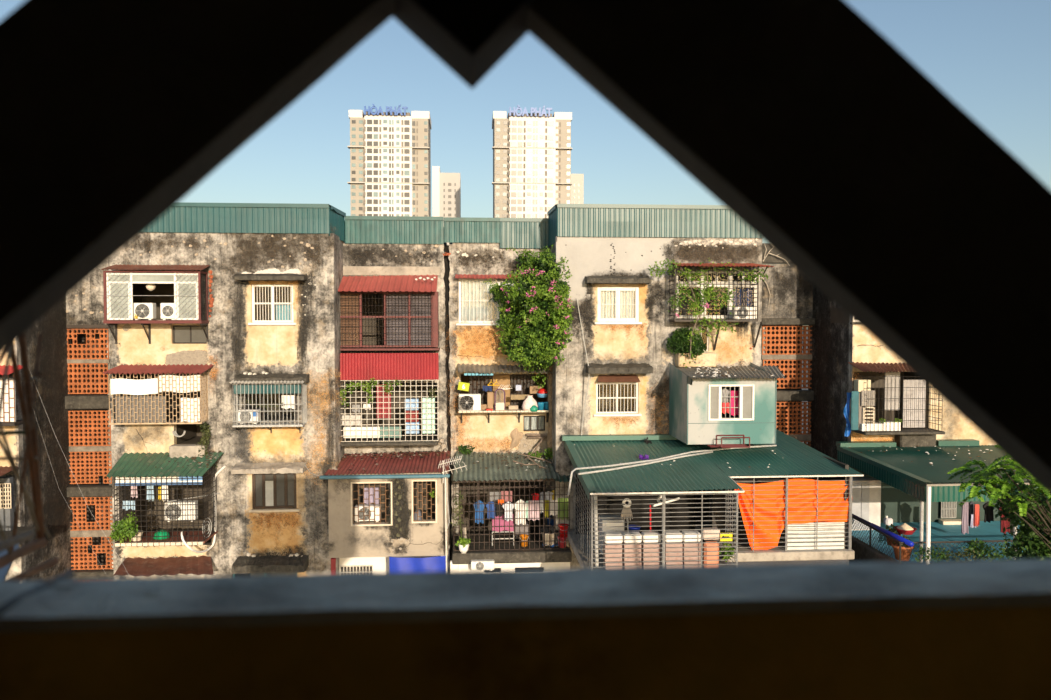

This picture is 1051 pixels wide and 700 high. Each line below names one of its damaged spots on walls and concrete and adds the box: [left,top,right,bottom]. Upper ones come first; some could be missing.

mould [131,235,213,255]
damp [345,244,440,267]
damp [641,242,760,271]
damp [225,233,334,408]
damp [568,243,672,353]
damp [724,322,756,339]
damp [767,272,844,462]
crack [410,244,481,571]
damp [318,411,336,474]